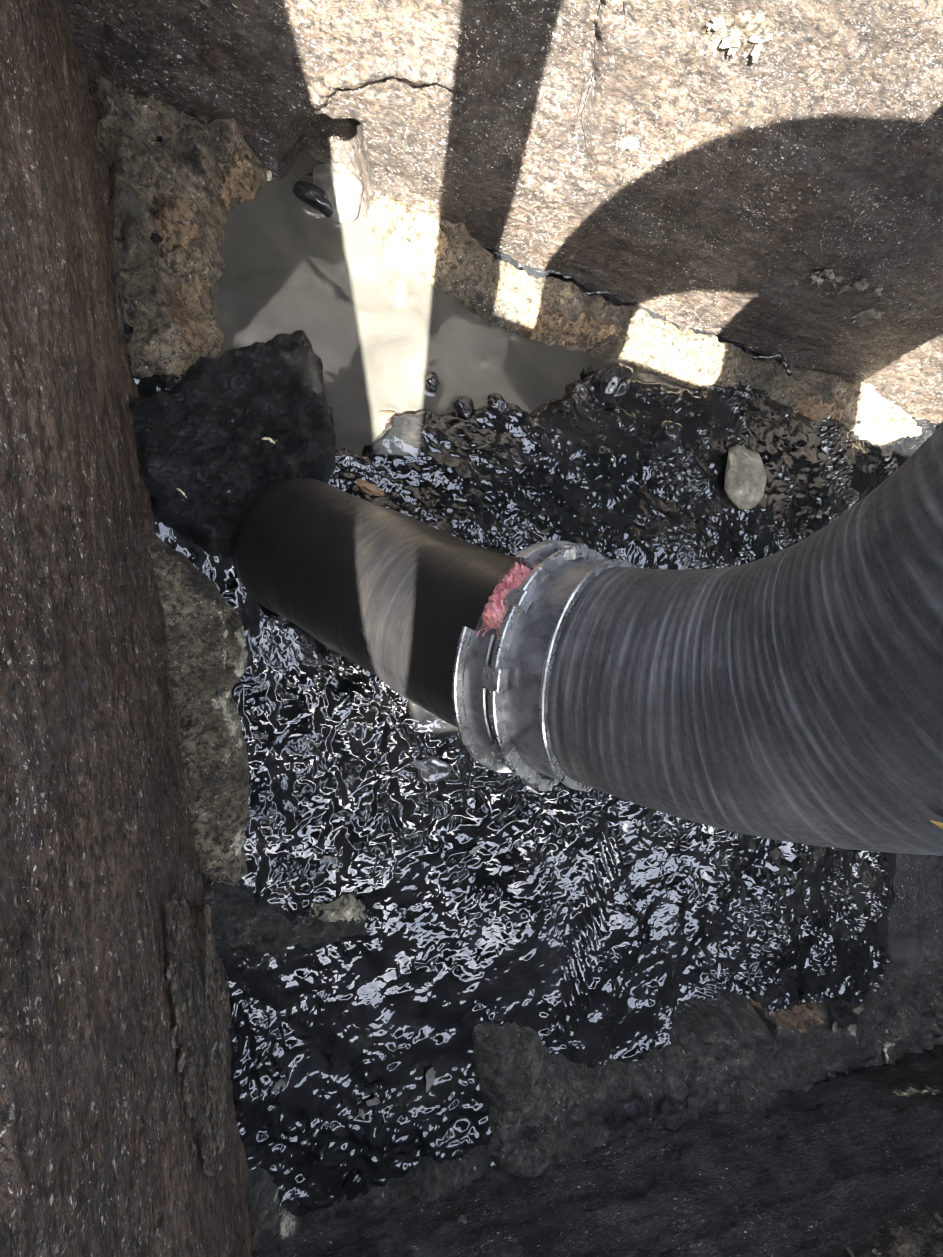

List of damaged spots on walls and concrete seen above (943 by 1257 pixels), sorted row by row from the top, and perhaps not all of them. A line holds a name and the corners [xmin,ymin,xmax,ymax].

crack [571,0,626,169]